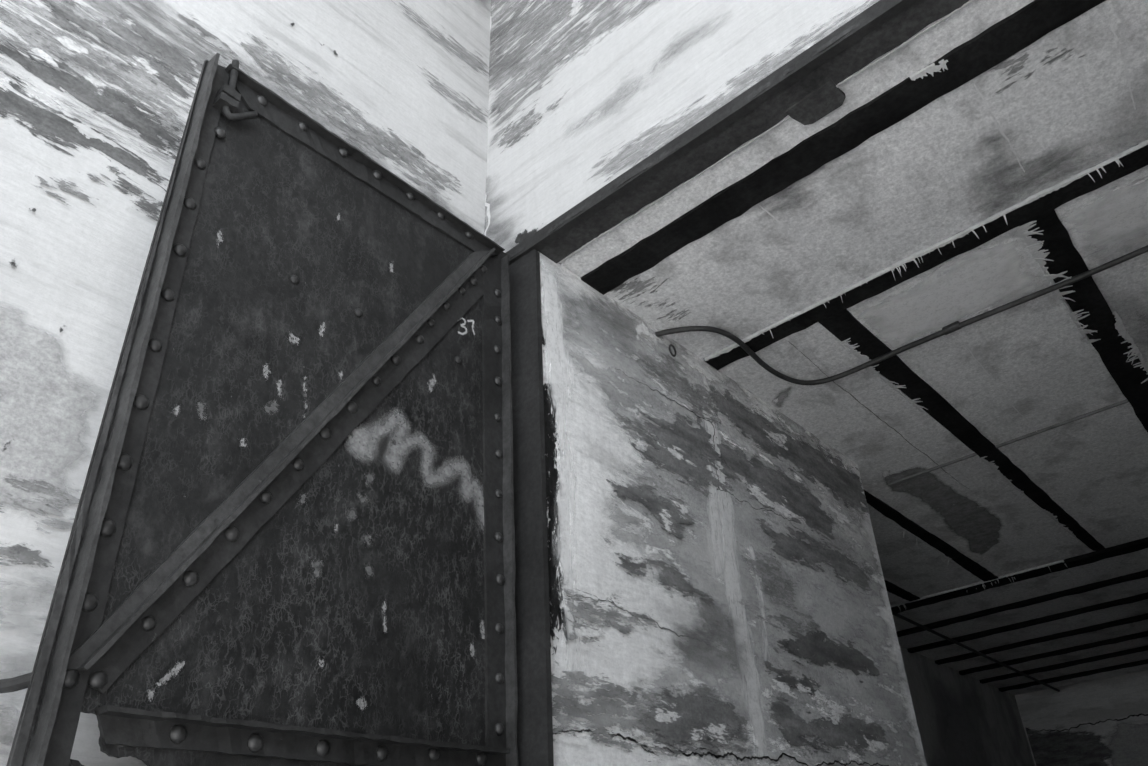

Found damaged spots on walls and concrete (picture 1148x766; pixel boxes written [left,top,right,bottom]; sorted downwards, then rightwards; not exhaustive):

peeling [0,0,460,221]
peeling [499,98,562,147]
leakage [909,59,948,81]
spalling [515,229,537,243]
leakage [704,140,1148,361]
peeling [551,277,928,766]
leakage [885,467,1002,554]
leakage [678,377,769,757]
leakage [890,560,1067,612]
crack [553,729,889,766]